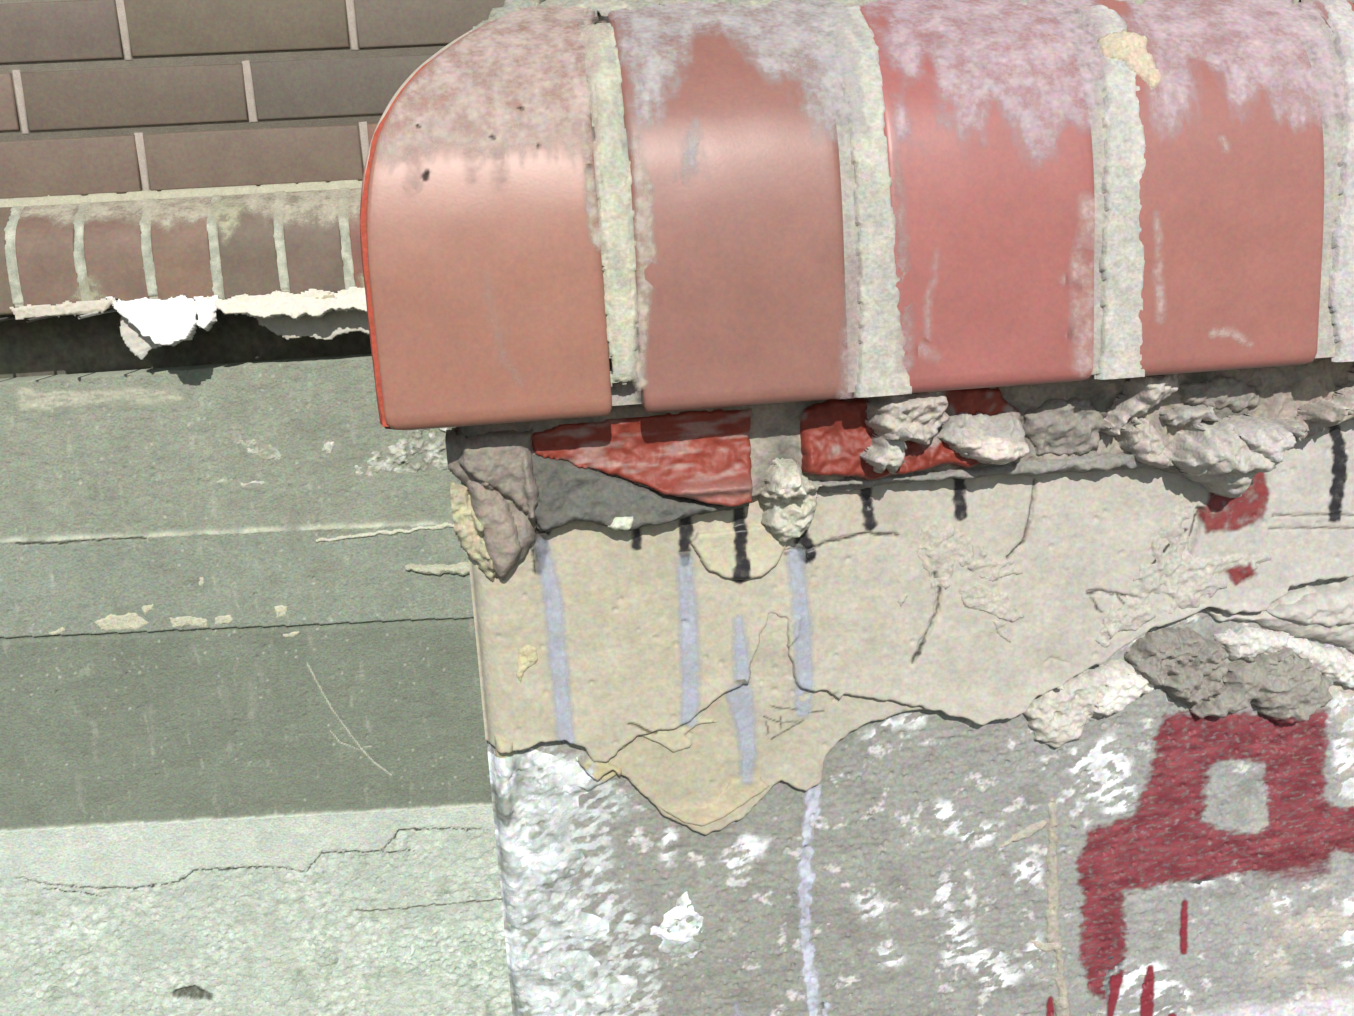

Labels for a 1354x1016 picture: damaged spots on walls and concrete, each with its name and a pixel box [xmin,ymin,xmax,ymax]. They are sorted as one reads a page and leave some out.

water stain [864,0,1106,158]
water stain [1127,0,1348,131]
water stain [21,188,362,226]
water stain [380,0,865,394]
peeling [9,287,367,346]
water stain [1073,257,1093,371]
spalling [236,439,282,461]
spalling [321,441,335,454]
spalling [355,427,454,477]
flaking render [468,420,1354,835]
crack [912,573,940,662]
crack [39,827,474,896]